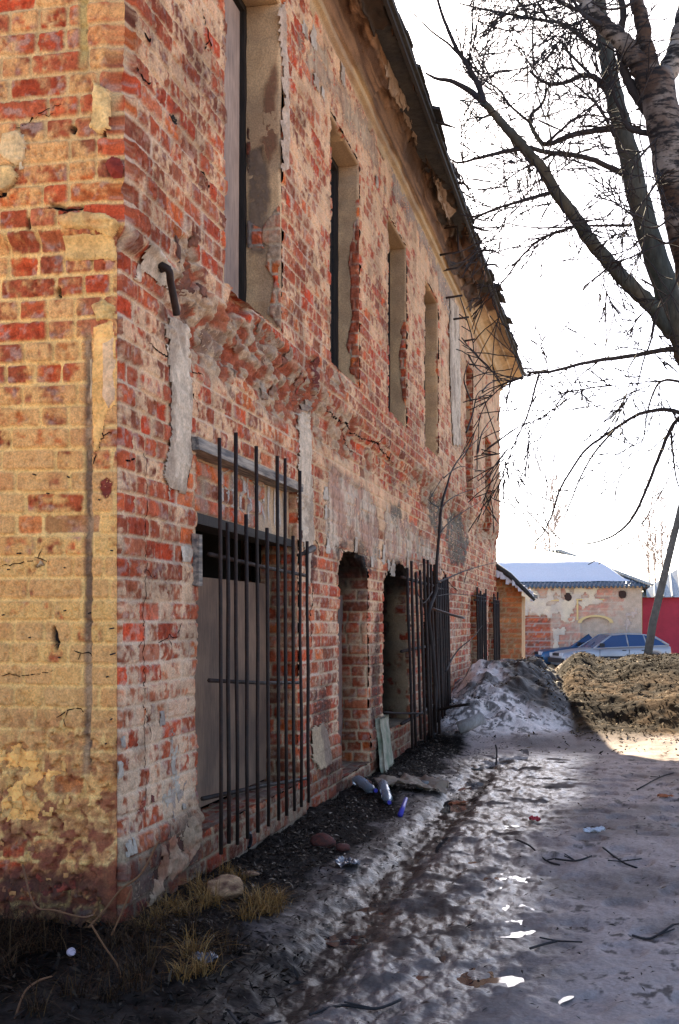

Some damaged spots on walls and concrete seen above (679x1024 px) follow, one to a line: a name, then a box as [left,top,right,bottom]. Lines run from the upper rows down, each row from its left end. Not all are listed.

crack [46,206,91,214]
peeling [134,231,207,298]
leakage [248,147,270,253]
peeling [299,20,492,447]
crack [325,407,394,465]
peeling [0,743,70,822]